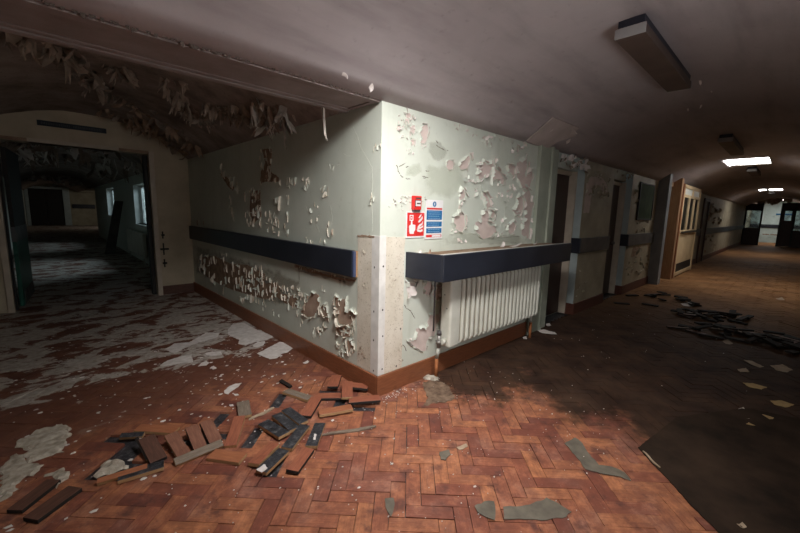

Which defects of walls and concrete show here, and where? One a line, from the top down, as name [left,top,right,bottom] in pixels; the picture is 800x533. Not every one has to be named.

peeling [244,146,309,237]
peeling [397,107,430,156]
peeling [445,123,537,247]
flaking render [198,235,442,376]